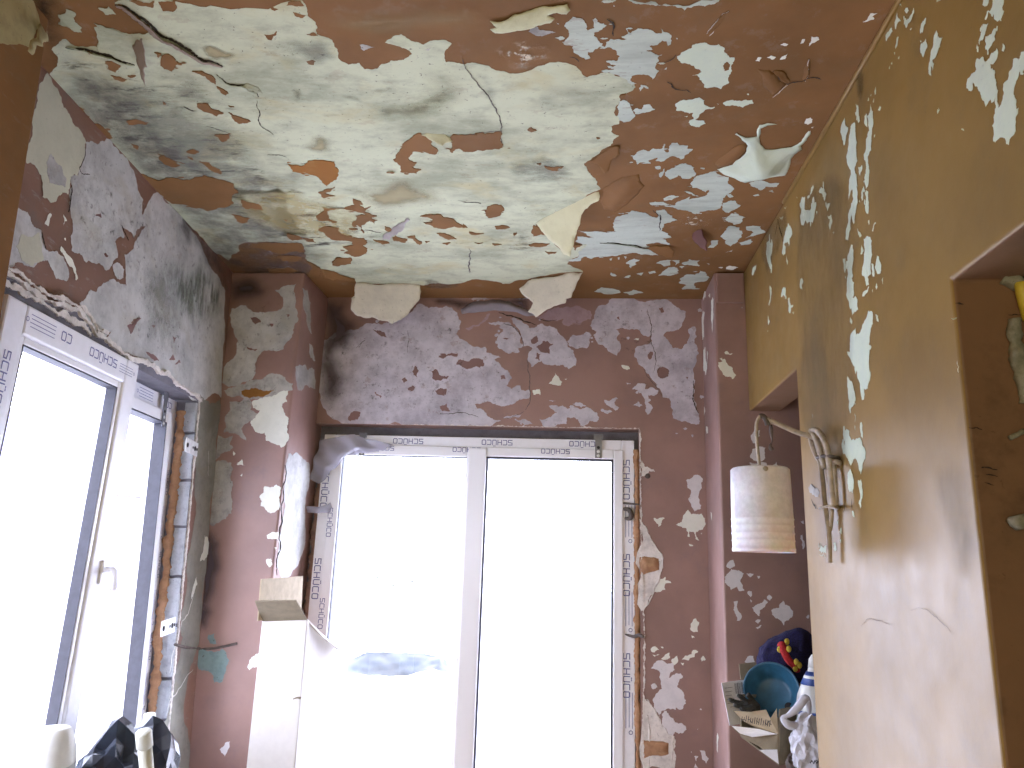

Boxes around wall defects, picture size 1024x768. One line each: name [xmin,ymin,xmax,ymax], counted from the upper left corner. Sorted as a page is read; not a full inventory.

crack [65,47,135,68]
water stain [85,79,207,179]
crack [115,5,306,164]
crack [462,59,503,142]
crack [772,59,820,98]
peeling [885,4,942,75]
peeling [966,0,1024,145]
peeling [800,182,834,233]
peeling [840,87,883,517]
peeling [0,0,819,768]